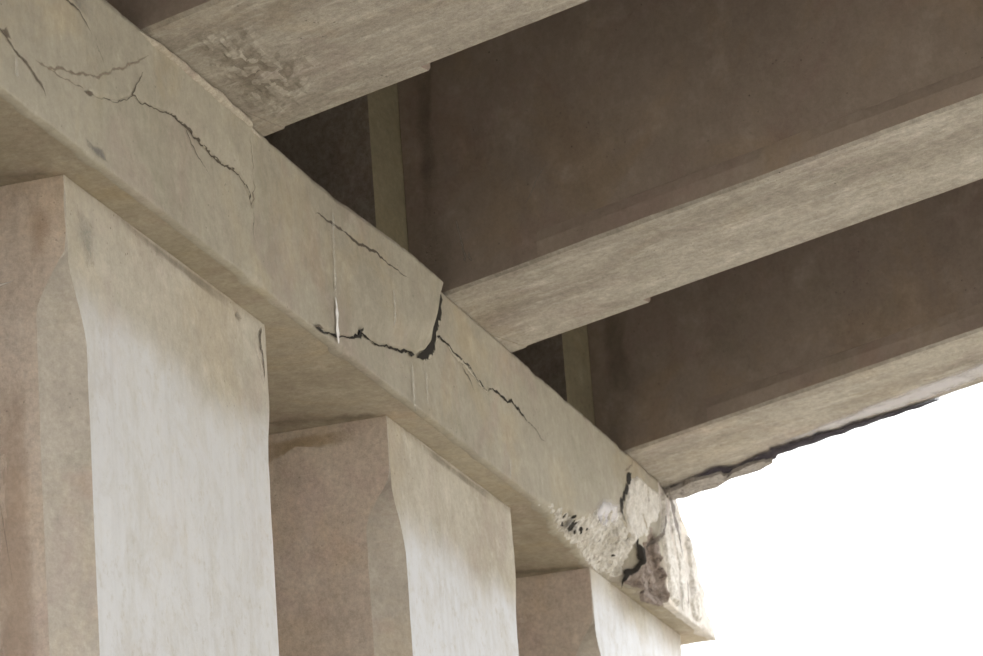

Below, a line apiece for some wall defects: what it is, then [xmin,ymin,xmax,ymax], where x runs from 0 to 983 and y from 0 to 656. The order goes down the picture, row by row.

crack [85,72,251,199]
crack [318,213,405,276]
crack [258,329,266,378]
crack [316,294,544,441]
spalling [560,513,588,534]